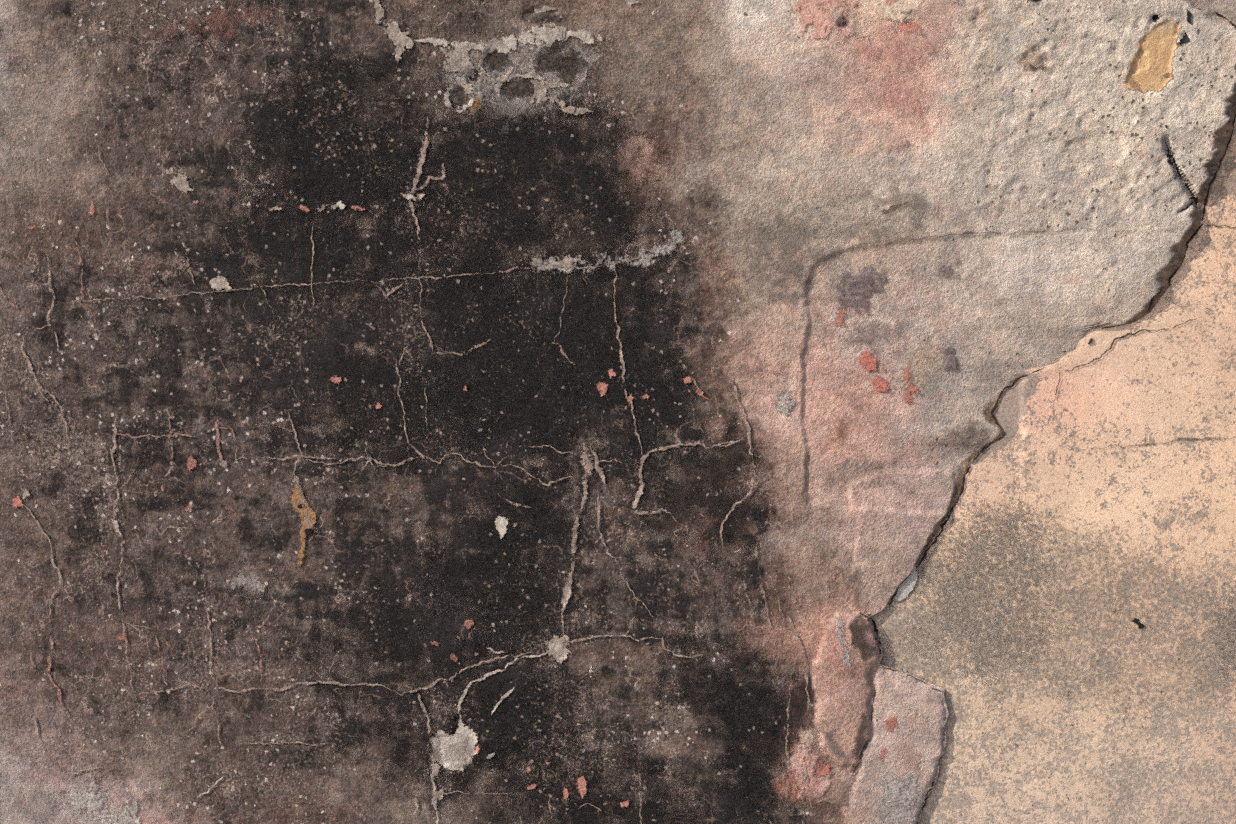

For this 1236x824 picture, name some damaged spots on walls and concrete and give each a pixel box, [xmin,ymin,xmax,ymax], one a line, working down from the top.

spalling [374,0,613,115]
spalling [1123,0,1236,93]
efflorescence [532,228,684,273]
crack [917,115,1236,567]
rust [292,477,317,566]
crack [0,118,773,824]
damp [232,574,265,591]
damp [61,781,141,824]
spalling [429,712,495,807]
crack [744,548,810,824]
peeling [842,667,947,824]
crack [850,594,946,823]